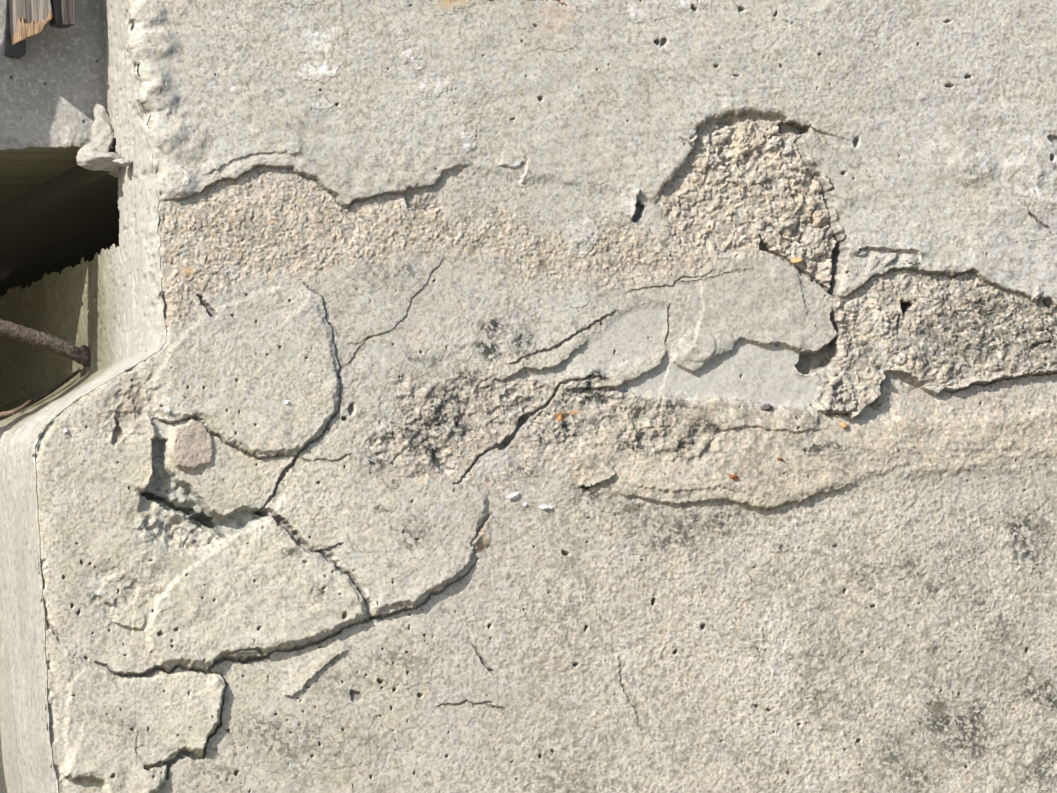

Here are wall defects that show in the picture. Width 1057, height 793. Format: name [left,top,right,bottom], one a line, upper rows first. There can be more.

spalling [163,112,1057,416]
spalling [473,450,520,477]
crack [94,257,495,780]
peeling [507,492,555,510]
flaking render [580,465,861,509]
crack [435,699,506,710]